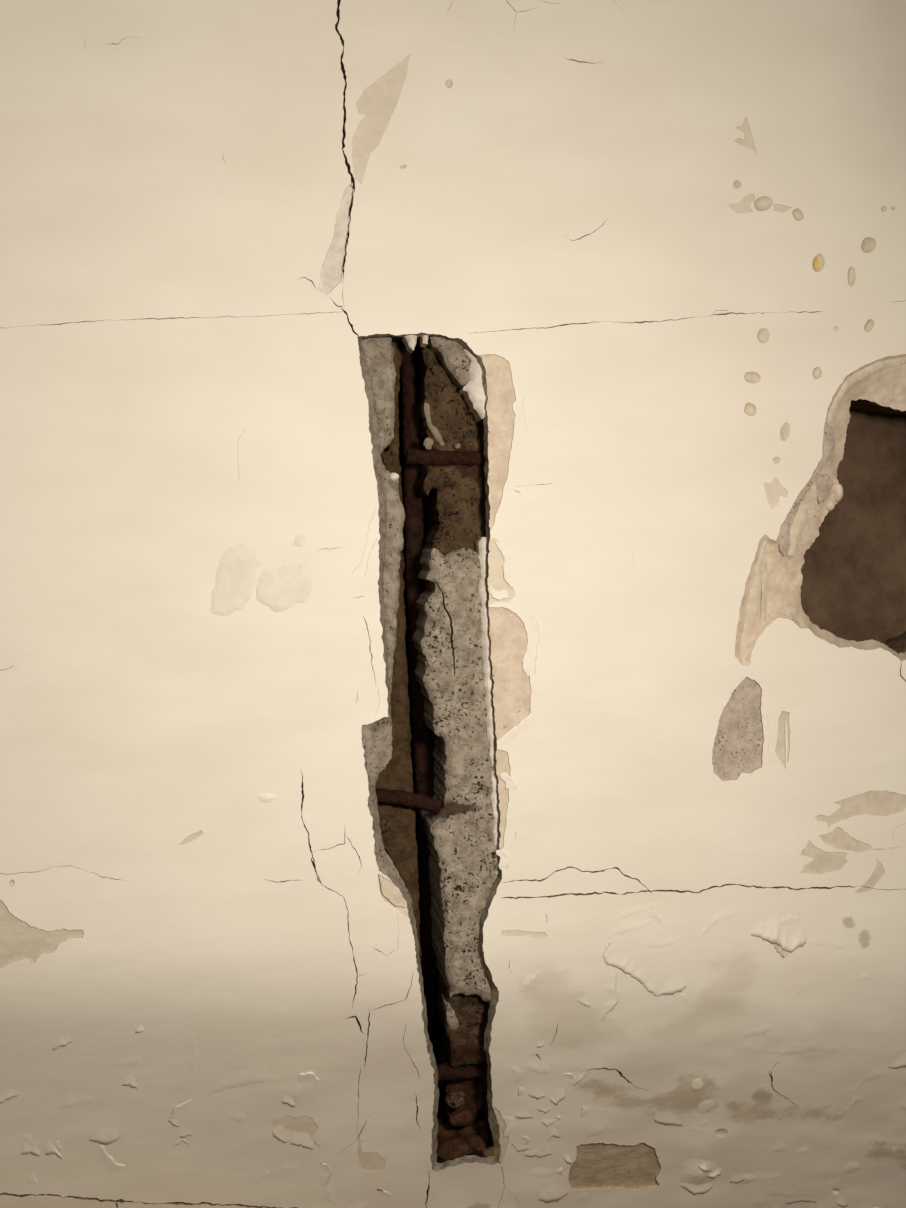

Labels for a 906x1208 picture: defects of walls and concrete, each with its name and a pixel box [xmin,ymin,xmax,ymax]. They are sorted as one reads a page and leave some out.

crack [9,0,359,336]
peeling [317,55,410,295]
peeling [728,180,804,221]
crack [474,310,824,333]
spalling [712,354,906,781]
peeling [0,900,84,968]
crack [264,766,422,1153]
rust [439,801,475,821]
spalling [357,332,661,1208]
crack [498,866,899,899]
peeling [800,790,906,893]
crack [0,1192,297,1208]